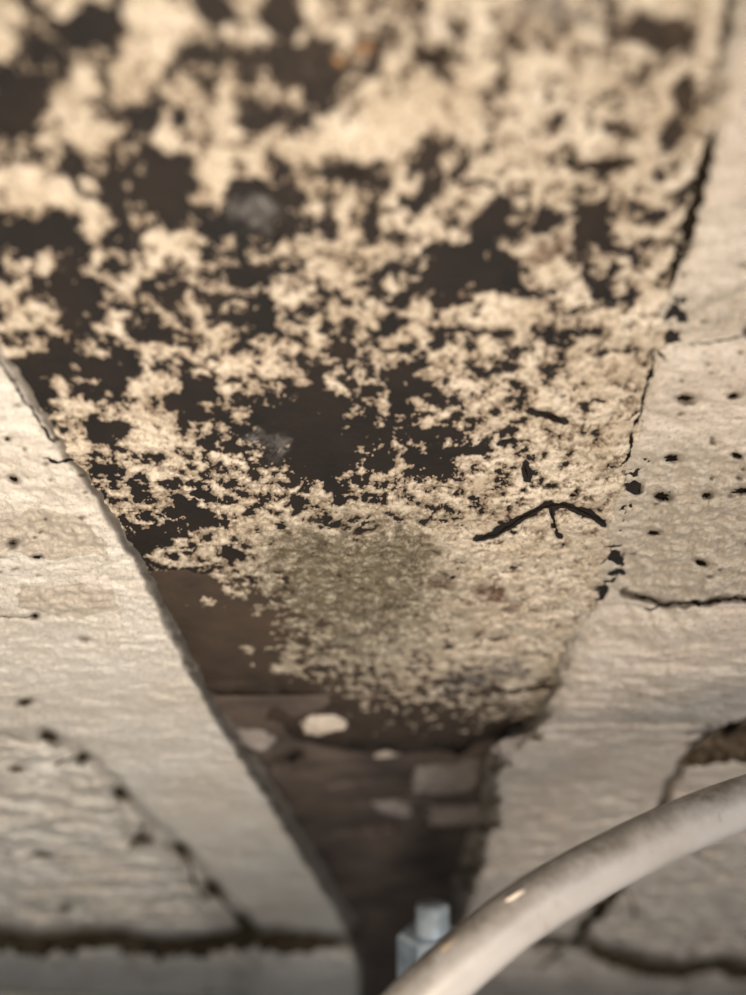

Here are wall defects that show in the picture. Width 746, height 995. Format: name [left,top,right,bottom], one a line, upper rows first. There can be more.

peeling [40,334,112,392]
crack [698,333,745,344]
peeling [197,375,287,425]
peeling [343,363,406,428]
spalling [0,508,109,561]
crack [478,503,601,540]
spalling [600,444,746,604]
crack [635,592,746,611]
peeling [148,564,554,752]
crack [51,755,79,766]
crack [0,856,354,963]
crack [537,888,746,982]